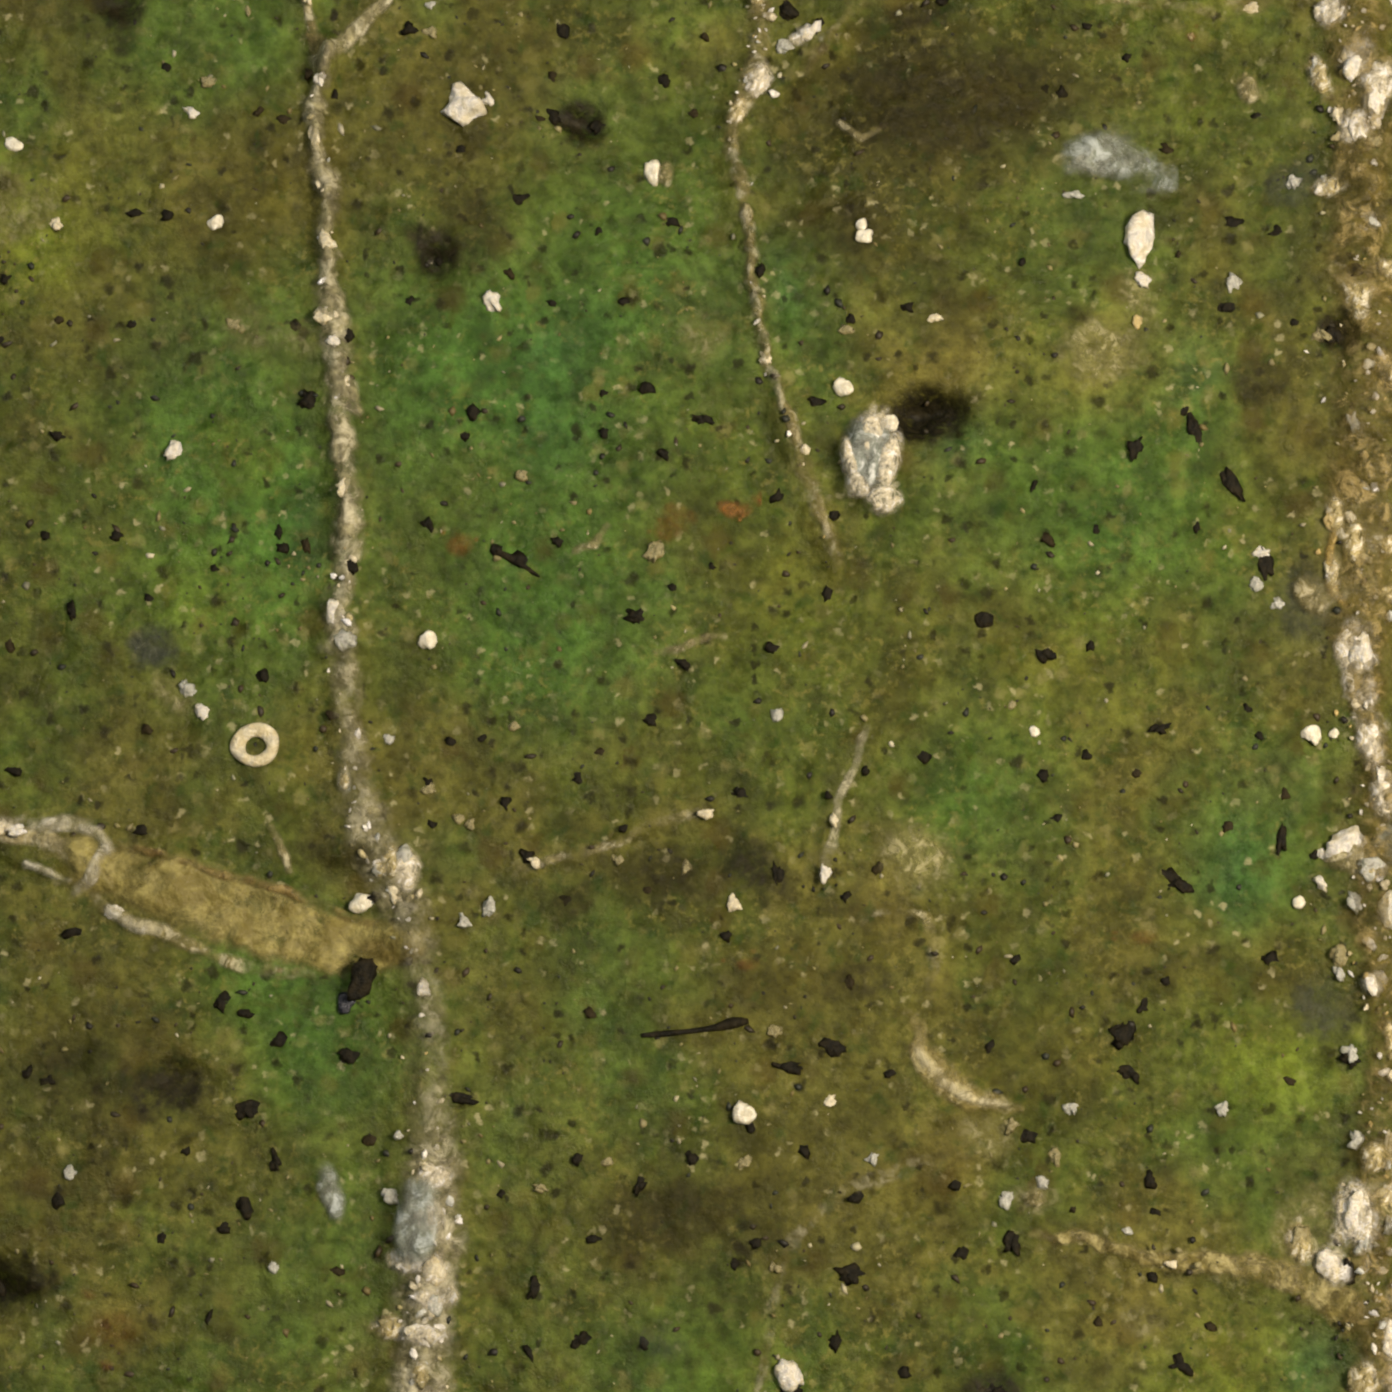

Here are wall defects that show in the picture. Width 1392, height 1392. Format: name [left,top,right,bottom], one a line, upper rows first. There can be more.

leakage [889,385,969,444]
peeling [68,836,423,1015]